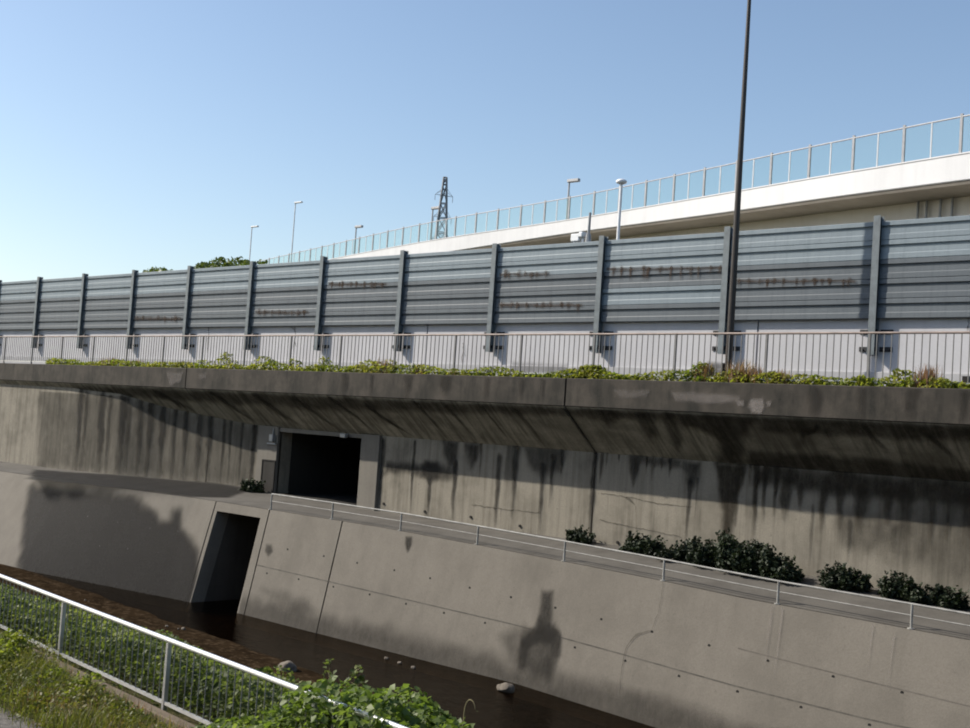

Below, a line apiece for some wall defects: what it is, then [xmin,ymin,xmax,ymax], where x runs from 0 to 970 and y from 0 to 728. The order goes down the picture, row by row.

water stain [76,388,970,534]
water stain [520,593,564,699]